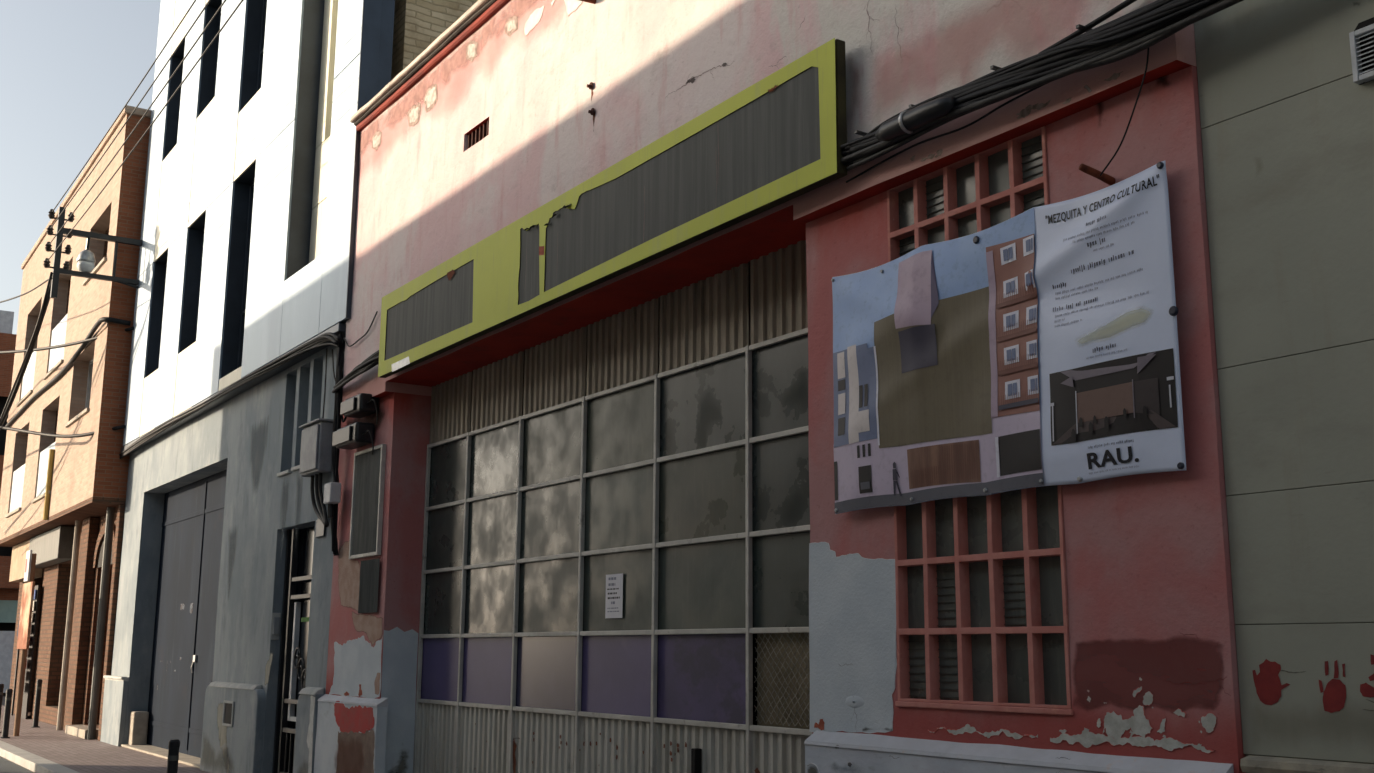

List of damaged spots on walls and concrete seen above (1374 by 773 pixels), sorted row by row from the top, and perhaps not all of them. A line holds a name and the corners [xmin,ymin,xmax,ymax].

peeling [505,0,583,36]
peeling [307,540,418,773]
peeling [809,542,897,748]
peeling [928,677,1217,754]